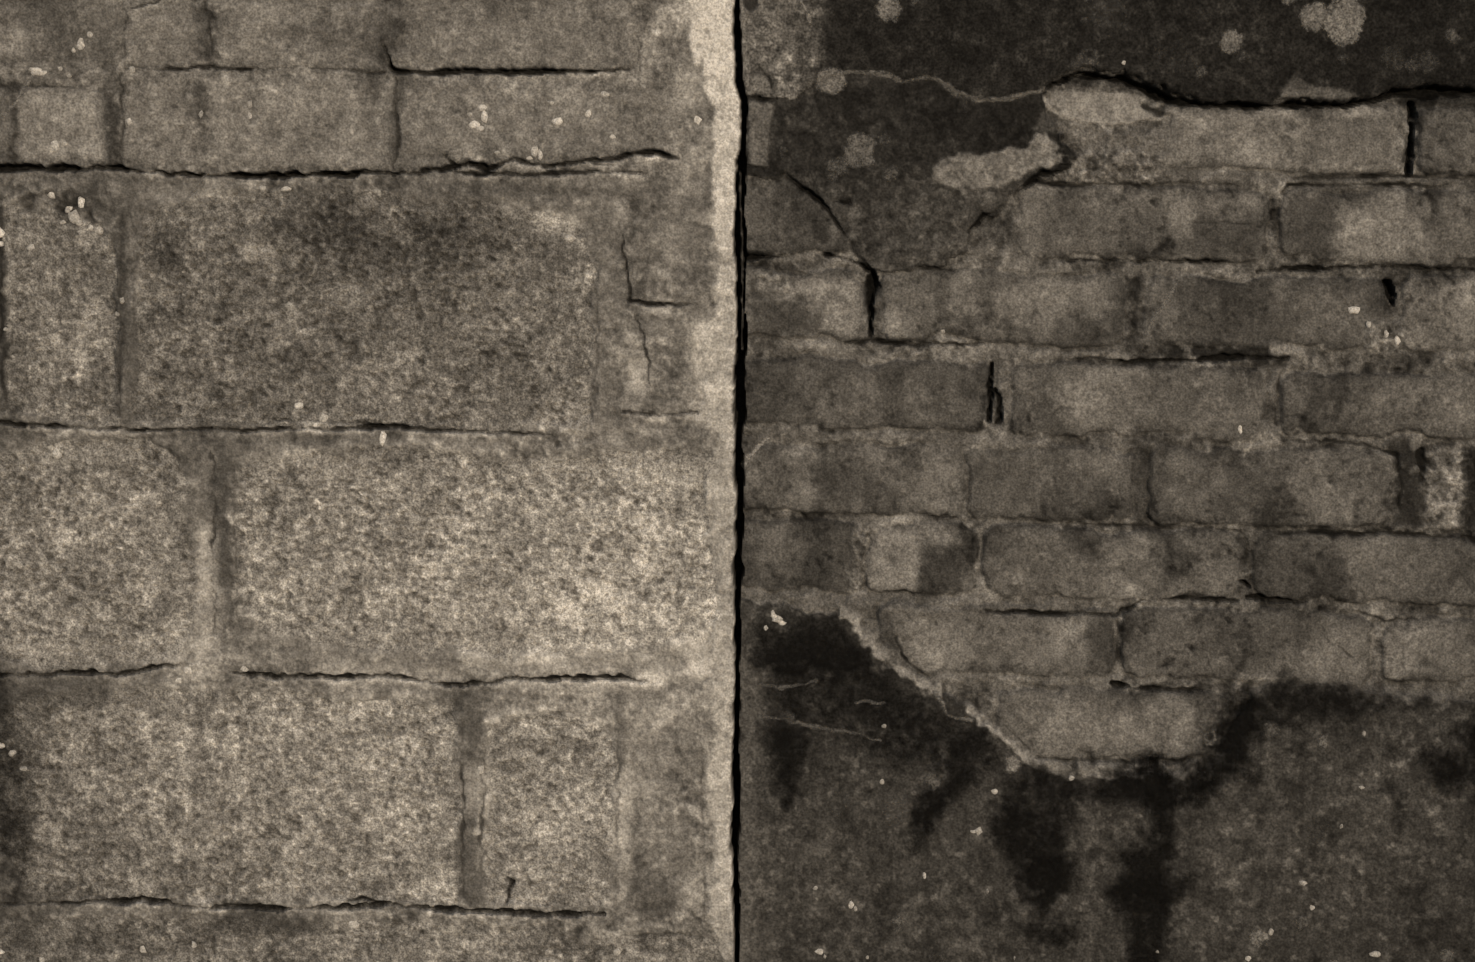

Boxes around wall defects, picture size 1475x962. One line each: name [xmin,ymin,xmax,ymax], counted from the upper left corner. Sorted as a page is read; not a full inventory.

crack [747,67,778,102]
crack [747,165,876,272]
spalling [741,67,1475,780]
leakage [991,673,1358,962]